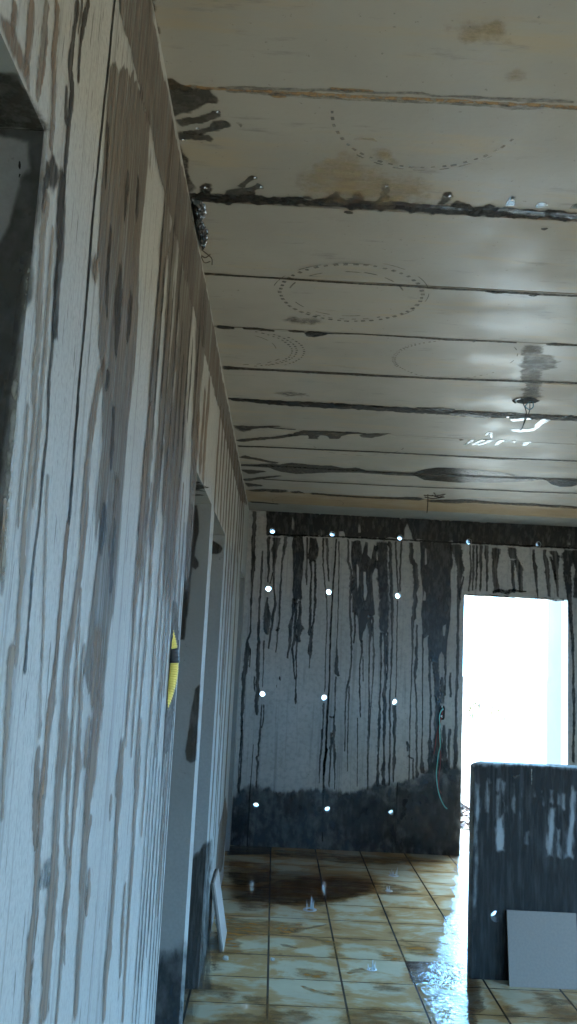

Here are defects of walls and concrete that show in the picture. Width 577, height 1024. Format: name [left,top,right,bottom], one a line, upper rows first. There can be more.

corrosion [167,79,577,110]
water stain [194,176,577,222]
water stain [512,346,557,403]
water stain [237,430,389,442]
water stain [459,432,530,446]
water stain [240,455,535,483]
water stain [40,0,265,1024]
water stain [230,511,577,856]